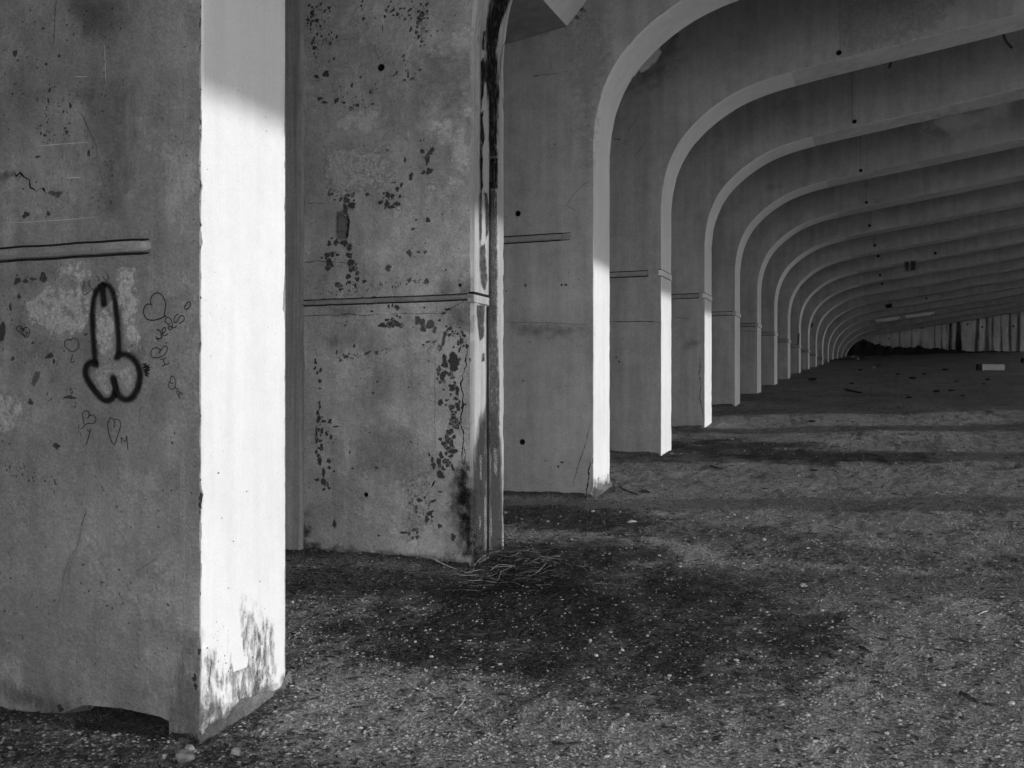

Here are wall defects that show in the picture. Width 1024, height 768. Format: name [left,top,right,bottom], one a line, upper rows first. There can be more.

crack [14,172,63,197]
flaking render [323,139,439,217]
peeling [313,189,512,543]
leakage [452,306,503,566]
crack [573,423,591,494]
leakage [201,617,272,727]